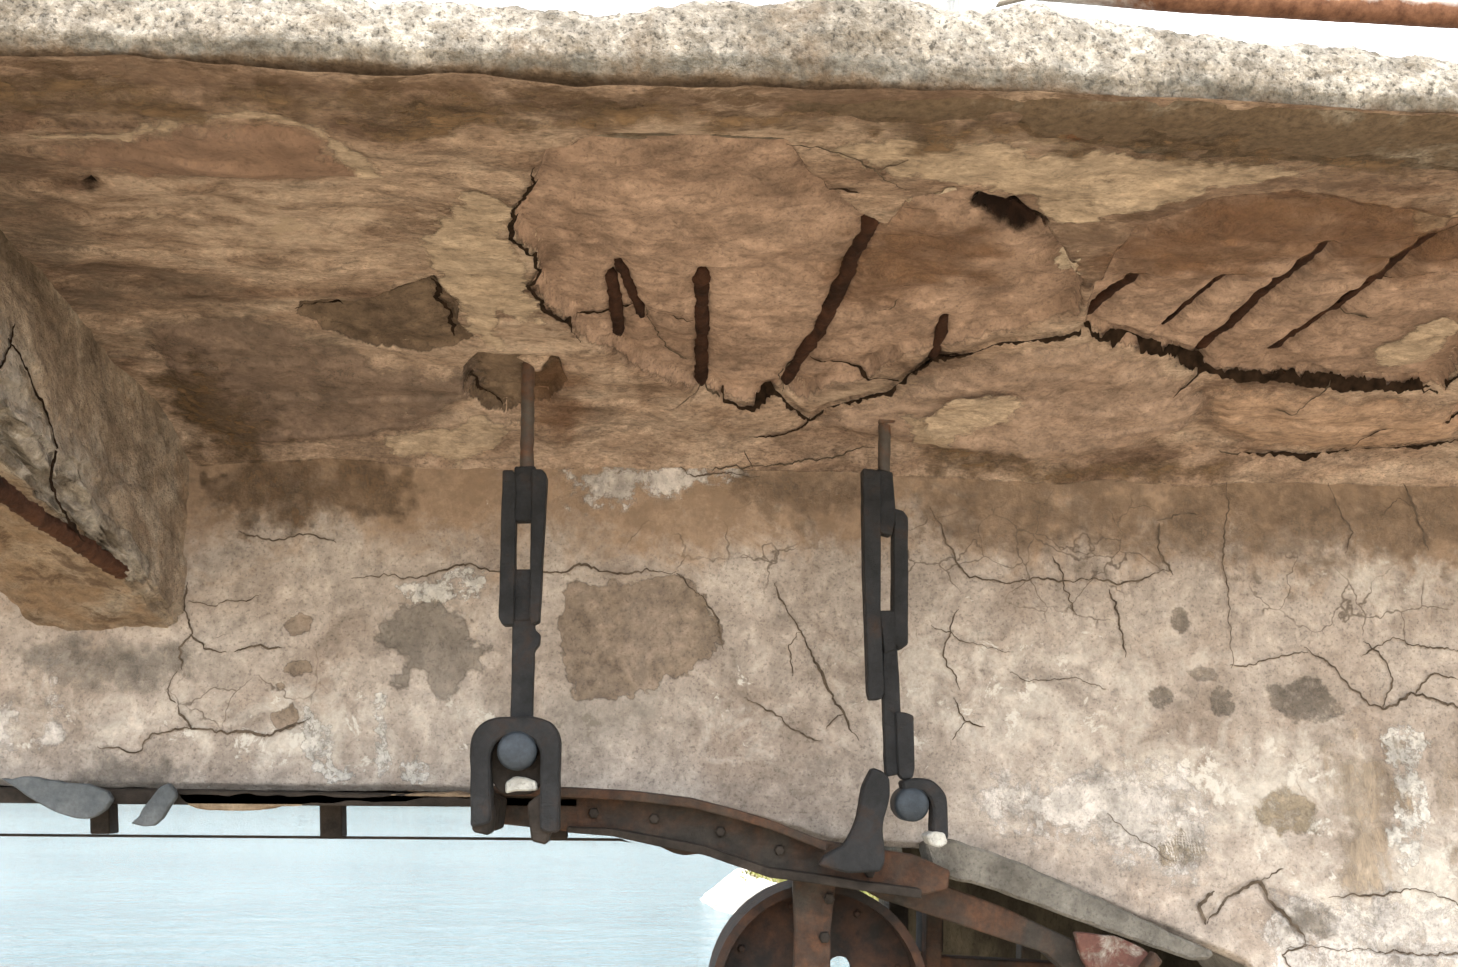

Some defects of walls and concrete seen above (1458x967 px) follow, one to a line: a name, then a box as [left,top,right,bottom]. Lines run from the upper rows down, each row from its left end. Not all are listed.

crack [787,144,908,193]
spalling [297,134,1458,466]
spalling [0,399,150,582]
crack [239,531,336,543]
crack [351,563,500,580]
crack [507,167,1458,741]
crack [97,582,311,753]
crack [1197,868,1458,967]